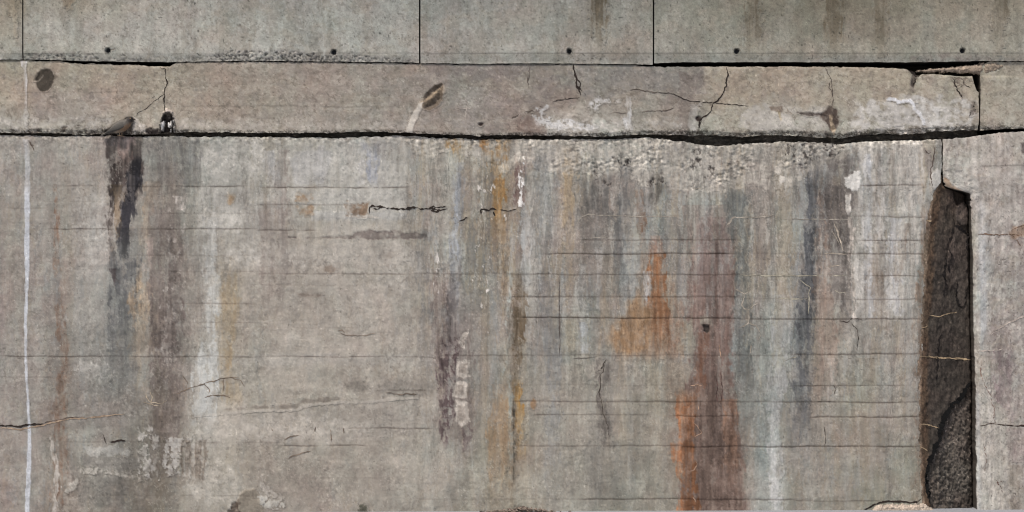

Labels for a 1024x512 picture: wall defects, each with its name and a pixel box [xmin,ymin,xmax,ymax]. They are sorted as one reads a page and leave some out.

efflorescence [514,94,633,136]
crack [613,67,745,133]
corrosion [768,104,843,133]
crack [369,205,516,221]
crack [0,414,125,443]
damp [99,135,222,478]
peeling [287,200,490,453]
corrosion [483,139,537,509]
crack [558,285,609,435]
corrosion [608,189,750,511]
spalling [404,76,1010,510]